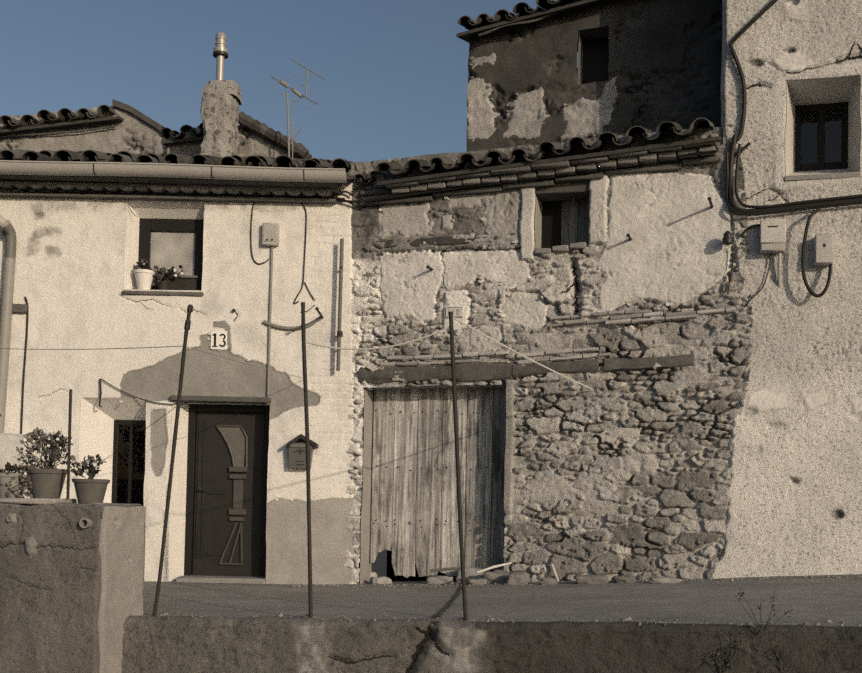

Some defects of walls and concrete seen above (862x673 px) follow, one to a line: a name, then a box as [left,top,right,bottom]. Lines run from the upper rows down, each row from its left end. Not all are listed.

spalling [467,53,550,142]
spalling [561,76,618,142]
crack [746,41,862,89]
flaking render [375,188,548,351]